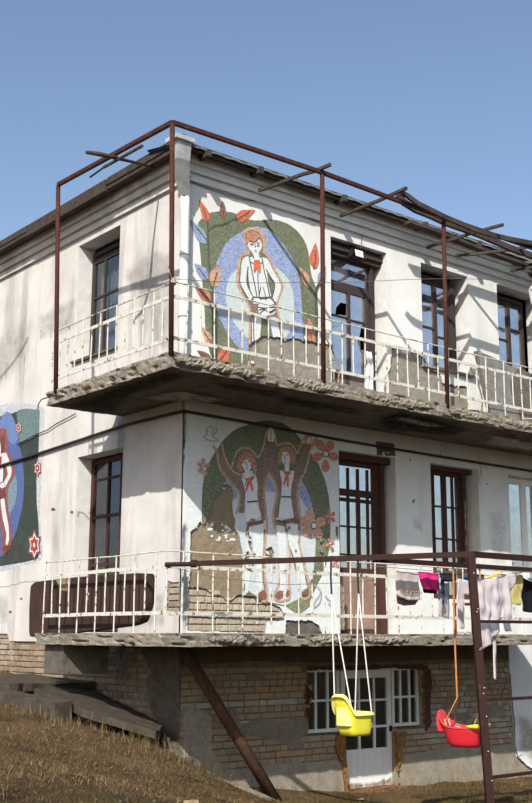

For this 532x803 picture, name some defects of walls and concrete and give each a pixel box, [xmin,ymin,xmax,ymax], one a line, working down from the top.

flaking render [366,348,490,421]
peeling [489,437,532,449]
flaking render [167,484,409,645]
flaking render [0,633,15,673]